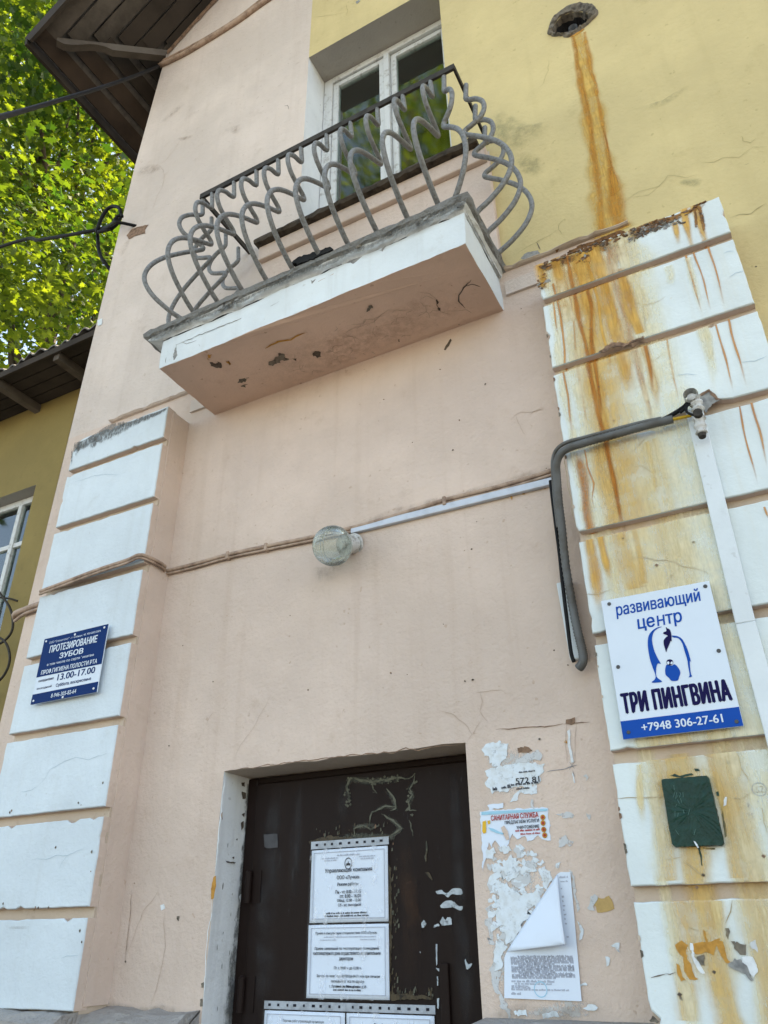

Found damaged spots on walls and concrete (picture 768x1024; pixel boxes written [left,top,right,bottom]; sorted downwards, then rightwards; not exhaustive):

spalling [521,200,706,289]
peeling [268,353,296,366]
spalling [599,336,644,352]
rust [535,32,746,664]
rust [739,403,764,465]
rust [637,733,687,811]
rust [712,671,768,1024]
peeling [587,896,614,913]
rust [688,847,721,938]
peeling [675,928,758,1001]